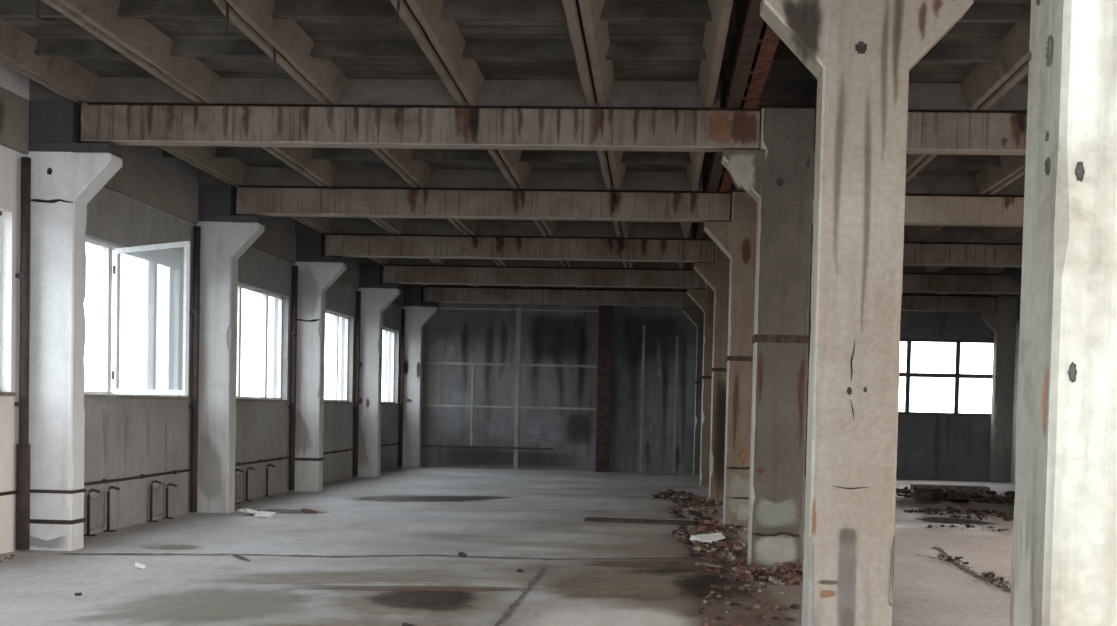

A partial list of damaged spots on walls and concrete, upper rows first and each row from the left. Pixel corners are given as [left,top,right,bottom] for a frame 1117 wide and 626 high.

leakage [774,0,820,61]
corrosion [709,111,757,143]
corrosion [734,376,746,462]